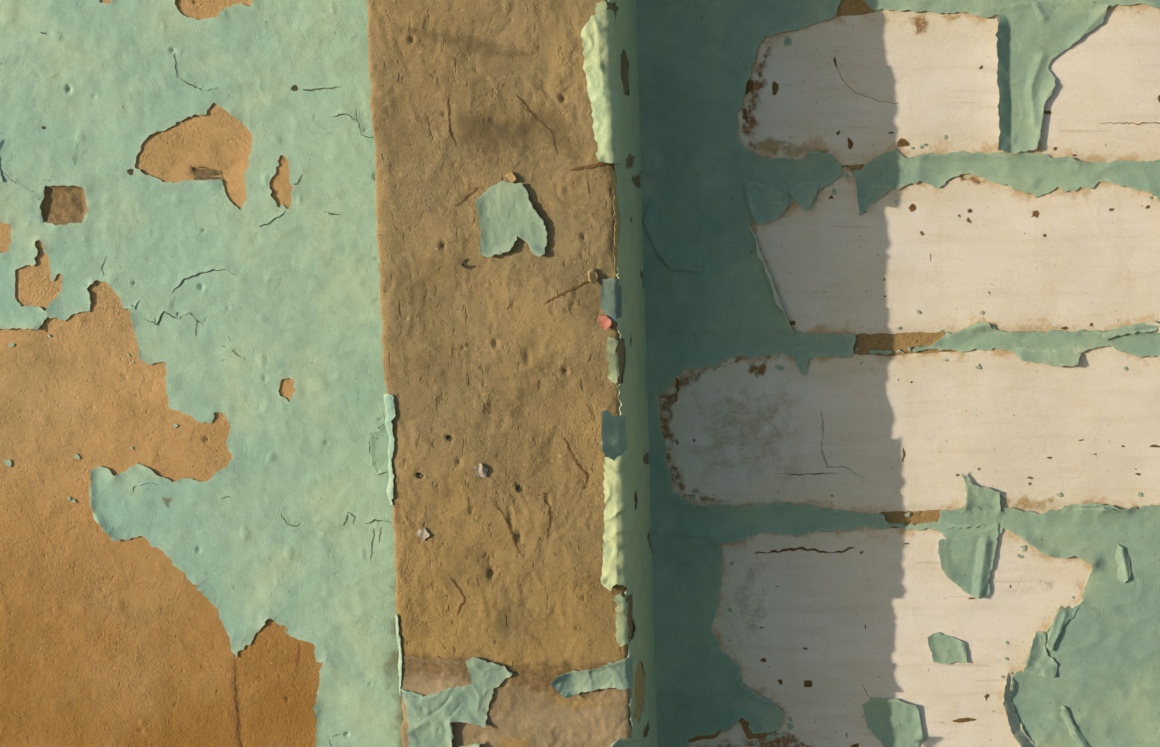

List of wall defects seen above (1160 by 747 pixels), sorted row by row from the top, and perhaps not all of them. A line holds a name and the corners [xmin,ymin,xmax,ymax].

crack [173,56,234,97]
crack [833,57,899,104]
crack [292,82,374,138]
crack [257,175,302,227]
crack [324,208,341,216]
crack [124,263,245,362]
peeling [0,0,657,747]
peeling [656,0,1160,747]
crack [281,503,301,527]
crack [343,512,391,563]
crack [755,546,855,554]